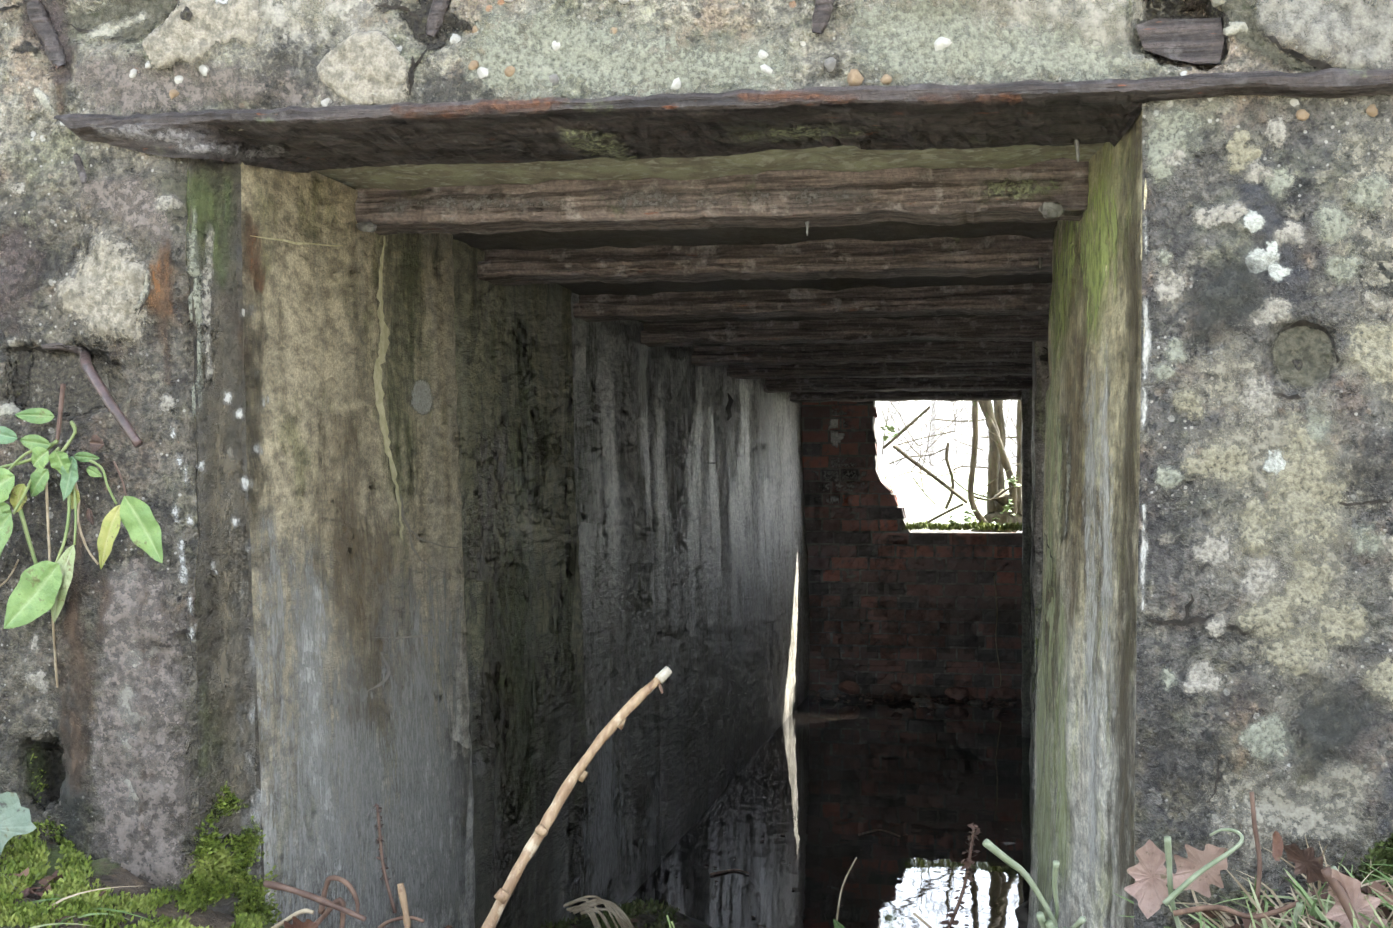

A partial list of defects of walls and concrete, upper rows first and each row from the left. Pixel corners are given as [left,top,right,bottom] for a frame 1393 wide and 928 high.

rust [147,249,172,381]
leakage [177,211,512,928]
leakage [1030,107,1393,928]